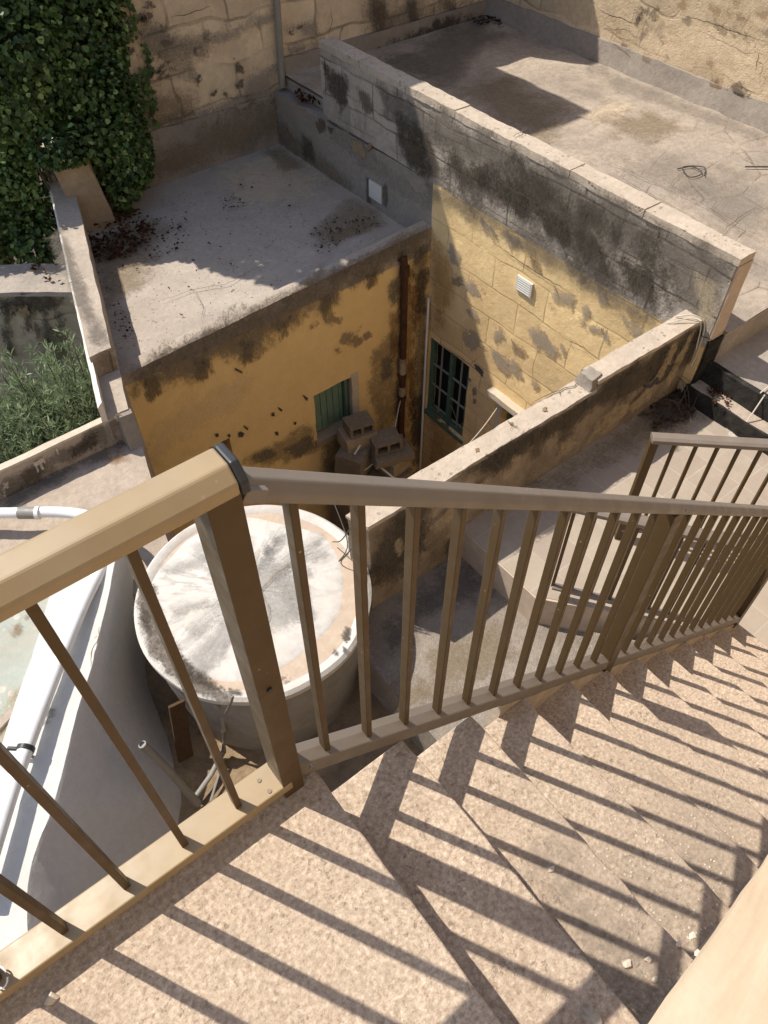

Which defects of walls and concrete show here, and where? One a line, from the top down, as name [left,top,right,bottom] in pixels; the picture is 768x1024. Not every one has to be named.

crack [600,10,638,56]
crack [684,15,764,70]
water stain [312,62,725,323]
water stain [133,225,429,465]
water stain [138,605,150,634]
water stain [172,601,240,695]
water stain [257,531,300,624]
water stain [332,627,351,655]